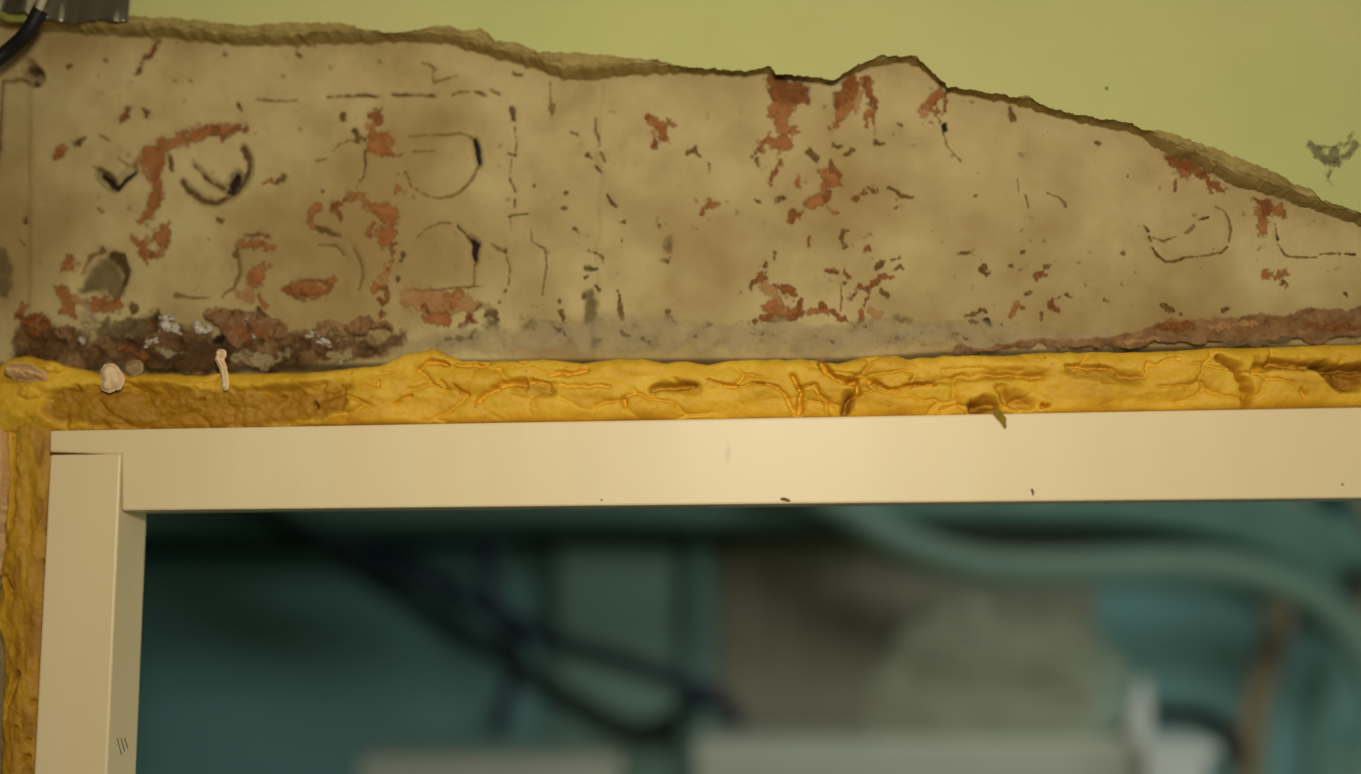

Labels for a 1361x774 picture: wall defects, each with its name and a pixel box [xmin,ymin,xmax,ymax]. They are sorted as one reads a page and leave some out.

crack [548,82,556,116]
crack [256,62,548,296]
crack [585,118,617,208]
spalling [0,11,1361,376]
crack [1144,207,1232,263]